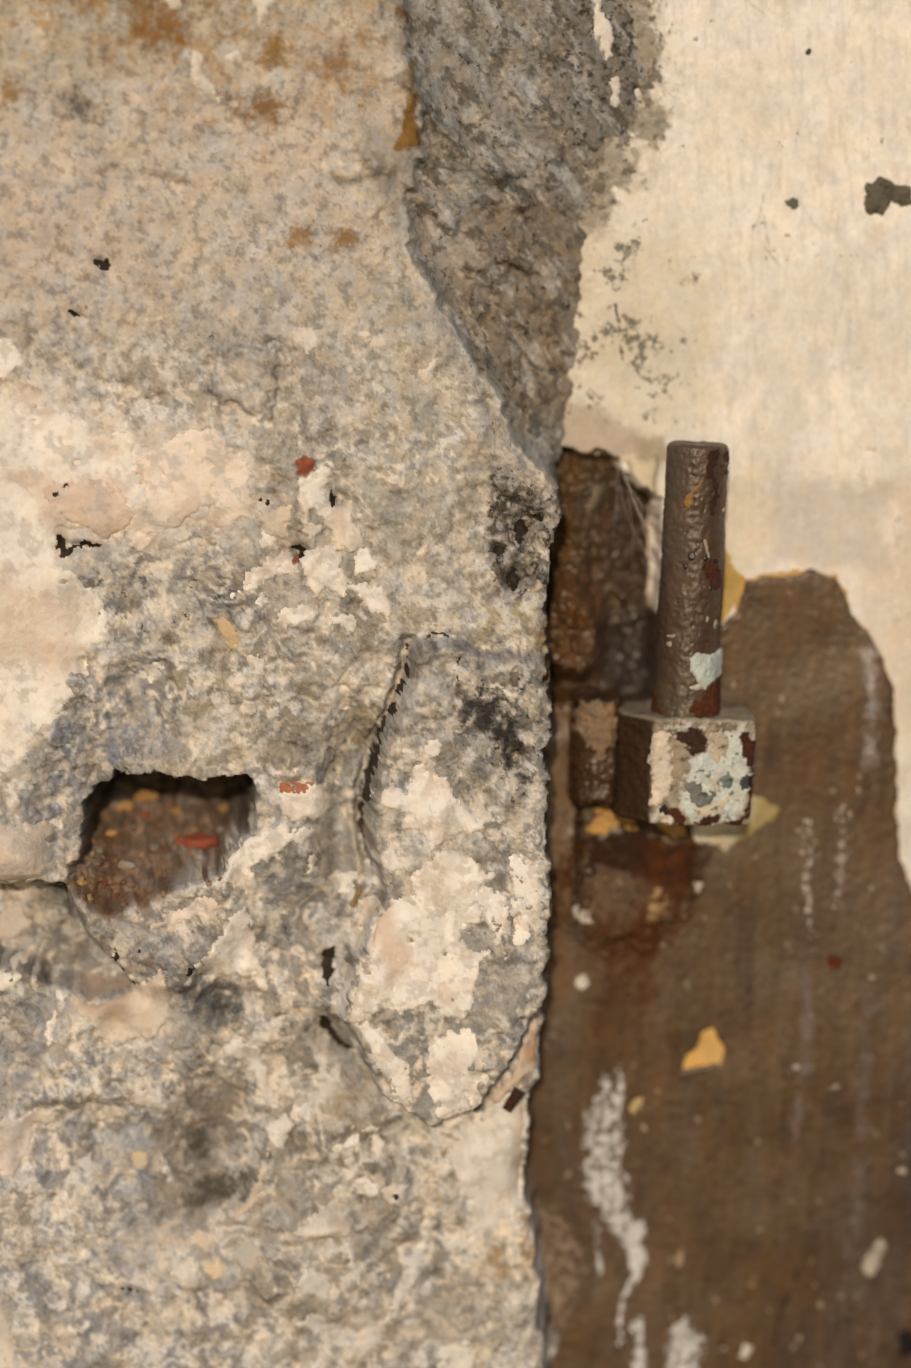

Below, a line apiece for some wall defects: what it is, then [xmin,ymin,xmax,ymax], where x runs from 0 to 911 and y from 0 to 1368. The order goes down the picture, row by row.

rust [706,449,730,515]
rust [702,560,722,589]
crack [357,631,461,866]
rust [676,676,721,756]
peeling [0,906,34,991]
peeling [150,781,335,991]
peeling [327,447,911,1368]
rust [552,732,756,1003]
peeling [44,952,171,1047]